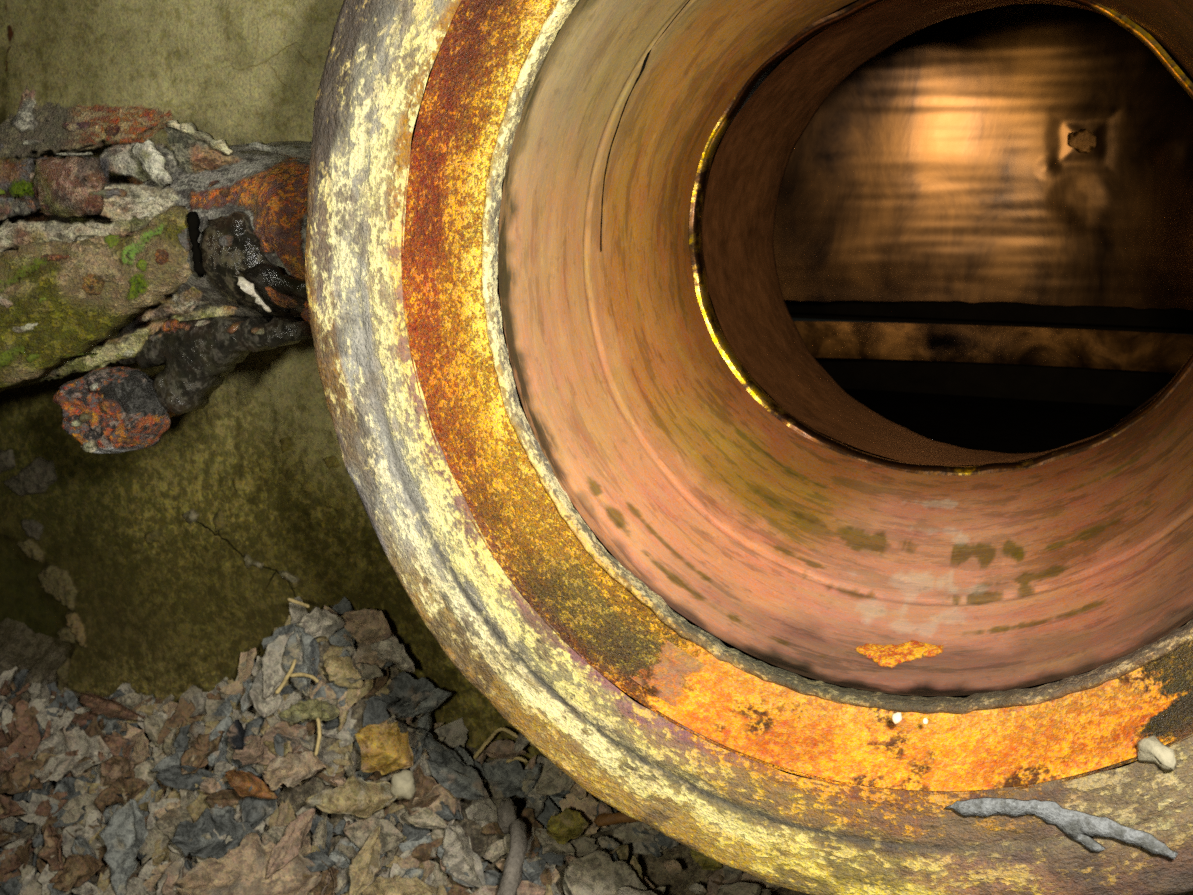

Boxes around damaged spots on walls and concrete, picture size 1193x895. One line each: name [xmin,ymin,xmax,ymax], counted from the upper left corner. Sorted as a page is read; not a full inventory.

crack [144,508,301,598]
rust [630,640,1187,791]